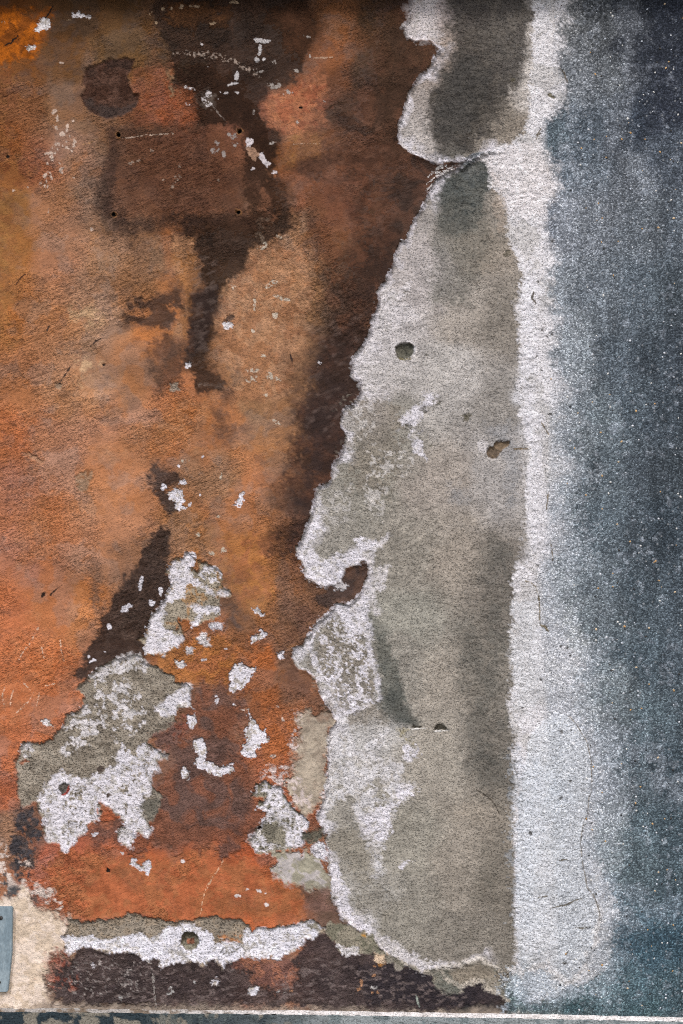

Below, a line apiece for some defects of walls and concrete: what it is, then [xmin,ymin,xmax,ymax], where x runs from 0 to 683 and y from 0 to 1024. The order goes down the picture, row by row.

corrosion [128,64,186,123]
corrosion [0,2,58,367]
corrosion [0,404,30,492]
peeling [59,0,532,1003]
damp [55,0,627,971]
corrosion [205,518,280,614]
corrosion [0,619,81,740]
peeling [12,546,276,876]
corrosion [153,631,250,683]
corrosion [256,707,299,774]
corrosion [32,841,303,928]